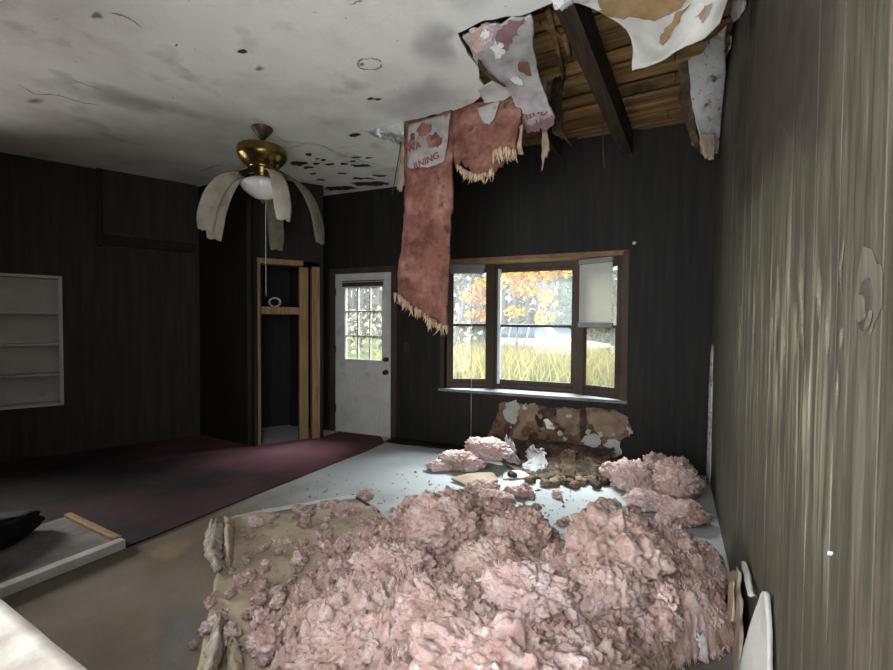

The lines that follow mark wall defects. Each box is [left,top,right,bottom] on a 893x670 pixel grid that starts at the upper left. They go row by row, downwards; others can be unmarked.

peeling [573,0,691,46]
peeling [695,3,712,23]
peeling [727,0,746,22]
leakage [291,153,389,191]
peeling [854,247,883,336]
peeling [488,400,633,462]